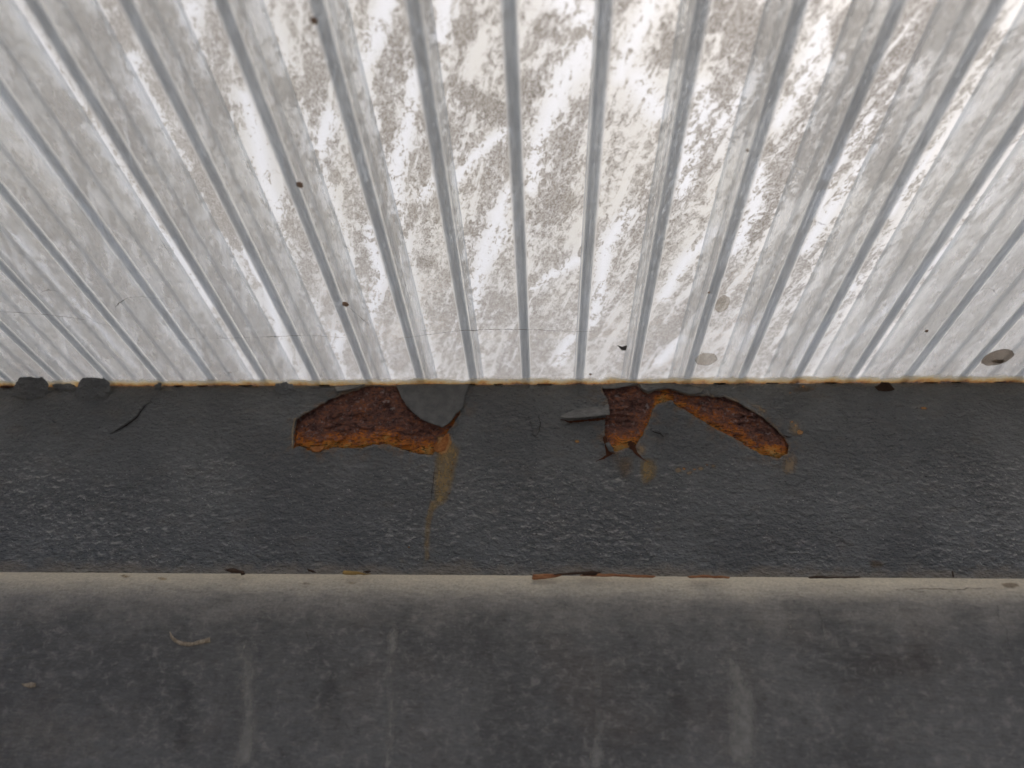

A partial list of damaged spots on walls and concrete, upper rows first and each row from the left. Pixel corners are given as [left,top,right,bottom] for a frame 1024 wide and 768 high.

corrosion [107,375,1024,503]